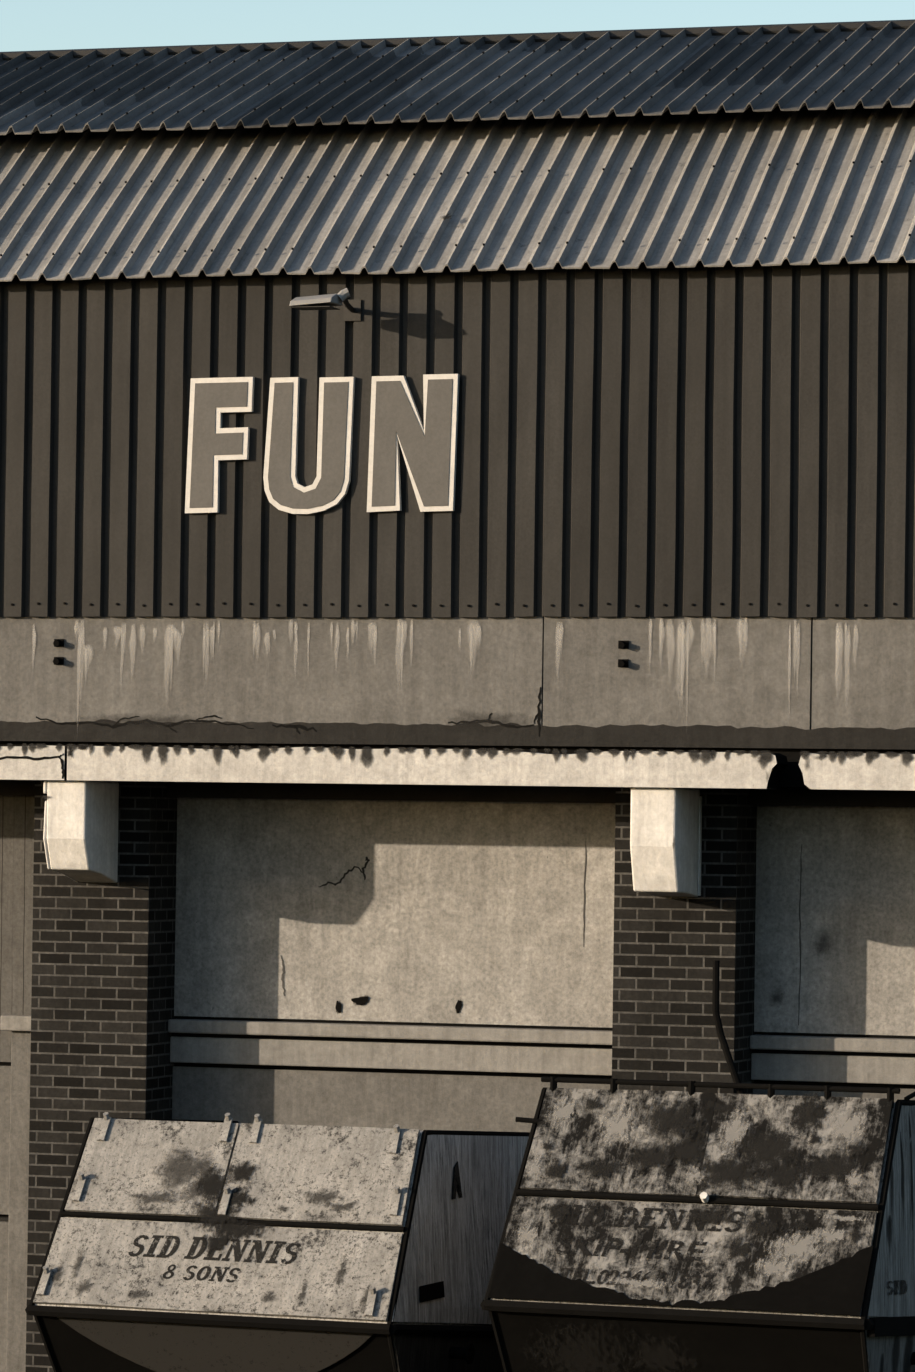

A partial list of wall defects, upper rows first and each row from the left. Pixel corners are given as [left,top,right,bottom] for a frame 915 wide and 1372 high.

crack [0,715,317,779]
leakage [7,743,772,768]
leakage [800,751,913,765]
crack [319,857,370,887]